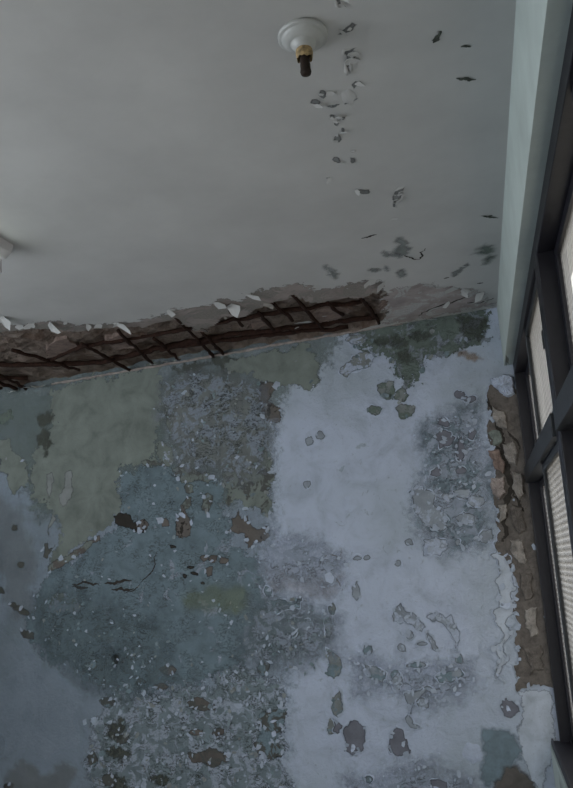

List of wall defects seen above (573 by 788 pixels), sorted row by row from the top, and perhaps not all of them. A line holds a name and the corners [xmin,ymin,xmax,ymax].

water stain [349,309,494,390]
water stain [36,411,54,457]
flaking render [0,280,497,579]
flaking render [367,355,553,718]
spalling [183,555,229,603]
peeling [83,579,344,788]
flaking render [325,687,368,757]
peeling [362,602,465,762]
water stain [481,728,535,788]